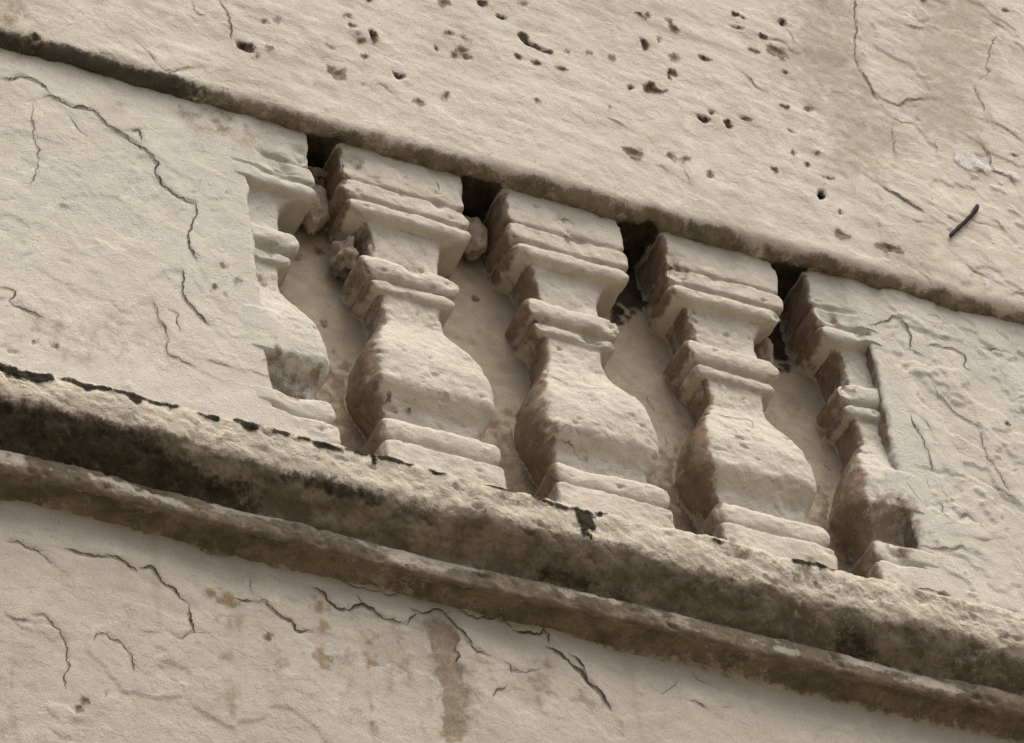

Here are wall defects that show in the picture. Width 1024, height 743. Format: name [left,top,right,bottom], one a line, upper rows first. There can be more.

spalling [237,42,273,58]
spalling [514,31,570,65]
spalling [627,53,680,93]
spalling [748,32,789,74]
crack [3,76,269,376]
damp [233,418,310,441]
damp [663,308,727,544]
damp [782,275,883,580]
damp [866,348,889,447]
crack [871,314,1016,499]
crack [12,540,203,669]
crack [312,582,612,711]